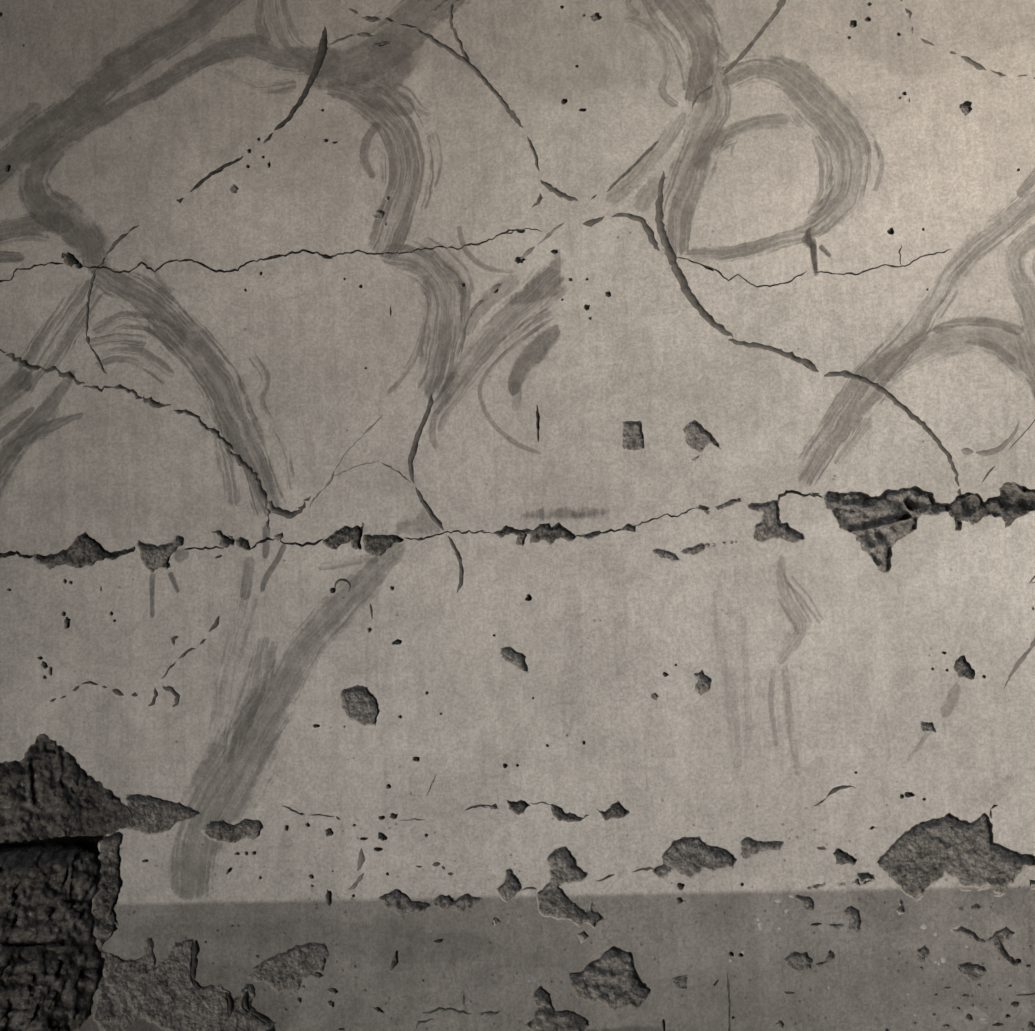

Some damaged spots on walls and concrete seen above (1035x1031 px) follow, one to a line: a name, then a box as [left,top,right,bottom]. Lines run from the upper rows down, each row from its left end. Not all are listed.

crack [0,0,1035,593]
spalling [822,482,1035,574]
spalling [339,685,380,728]
spalling [352,813,398,852]
spalling [0,734,329,1031]
spalling [497,868,522,903]
spalling [536,846,605,944]
spalling [652,836,784,904]
spalling [775,813,1035,934]
spalling [524,984,589,1031]
spalling [569,946,651,1011]
spalling [951,925,1031,969]